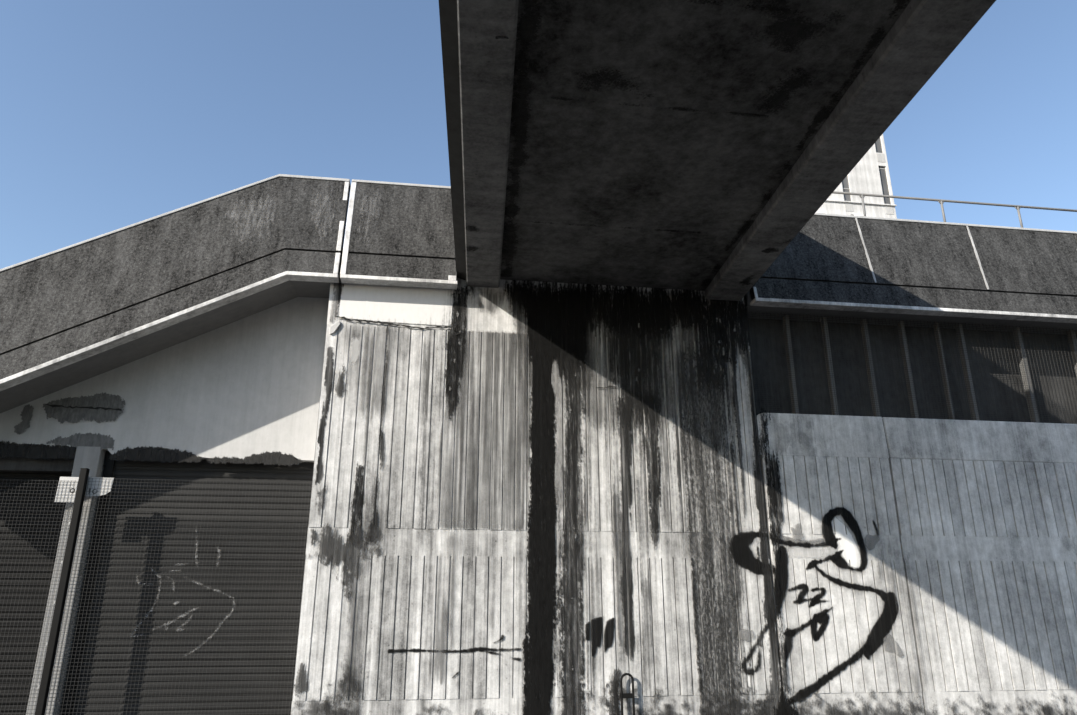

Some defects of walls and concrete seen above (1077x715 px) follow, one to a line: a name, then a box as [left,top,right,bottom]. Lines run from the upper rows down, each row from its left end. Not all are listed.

flaking render [0,392,304,466]
damp [315,347,335,485]
damp [330,279,389,548]
damp [436,568,454,683]
damp [423,288,533,551]
damp [551,291,1076,715]